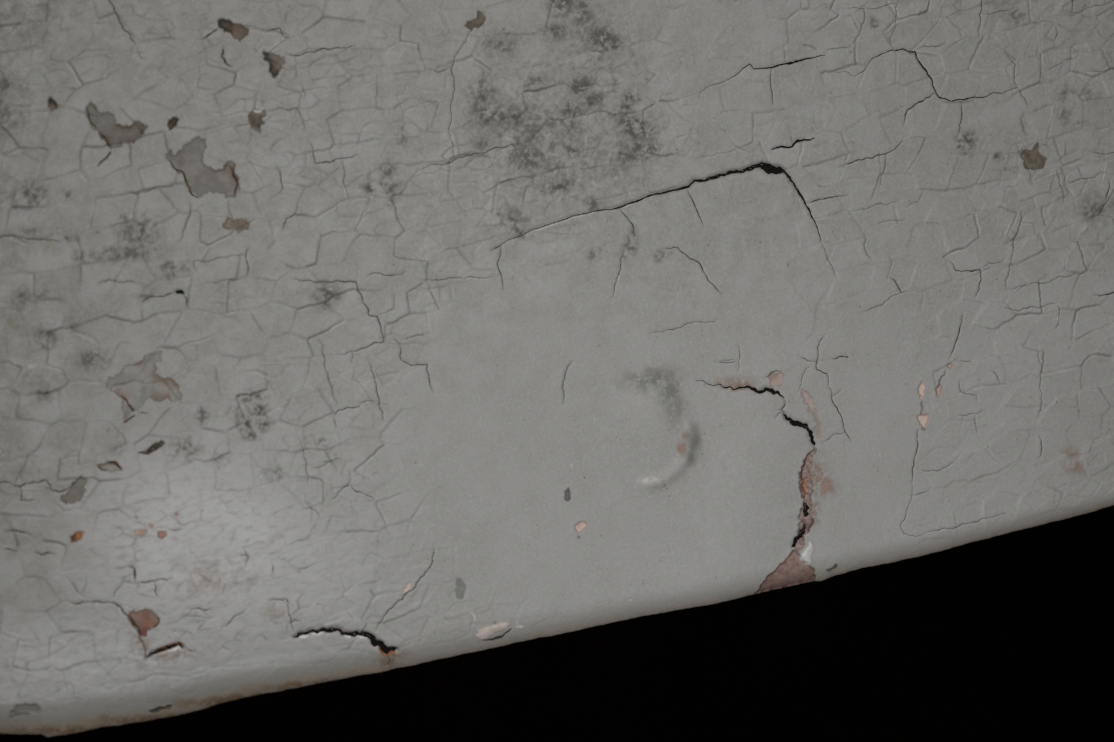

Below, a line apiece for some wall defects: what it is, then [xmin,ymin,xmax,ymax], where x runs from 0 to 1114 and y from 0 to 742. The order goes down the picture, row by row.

peeling [86,103,146,166]
peeling [166,138,240,198]
water stain [621,95,655,159]
crack [424,1,1027,311]
peeling [107,351,182,423]
crack [297,272,432,425]
crack [696,338,849,548]
peeling [755,389,837,594]
crack [71,568,193,658]
peeling [129,609,160,637]
crack [272,554,434,661]
peeling [471,611,524,640]